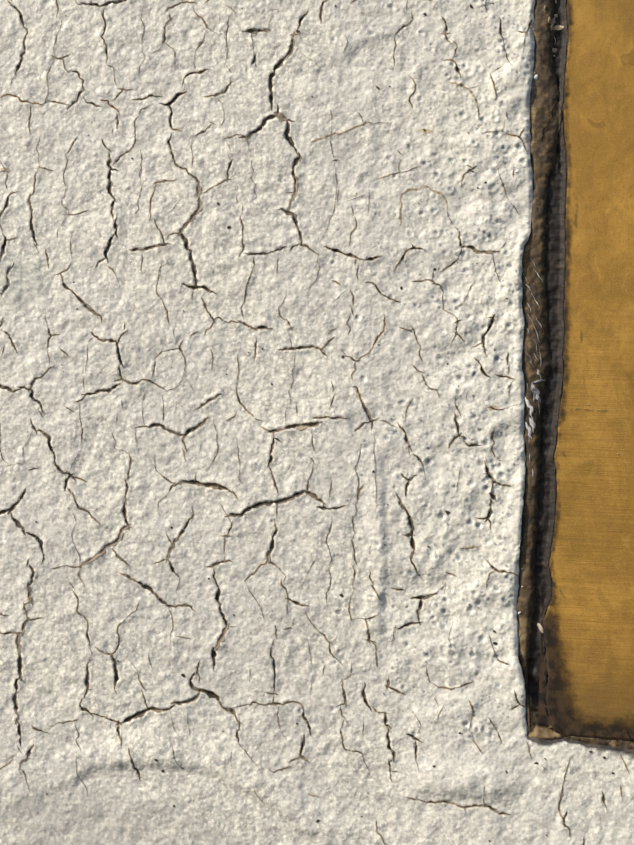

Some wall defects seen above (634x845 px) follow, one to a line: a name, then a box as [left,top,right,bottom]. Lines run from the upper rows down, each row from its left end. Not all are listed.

crack [432,1,562,175]
crack [0,0,519,797]
crack [406,781,511,815]
crack [602,730,632,810]